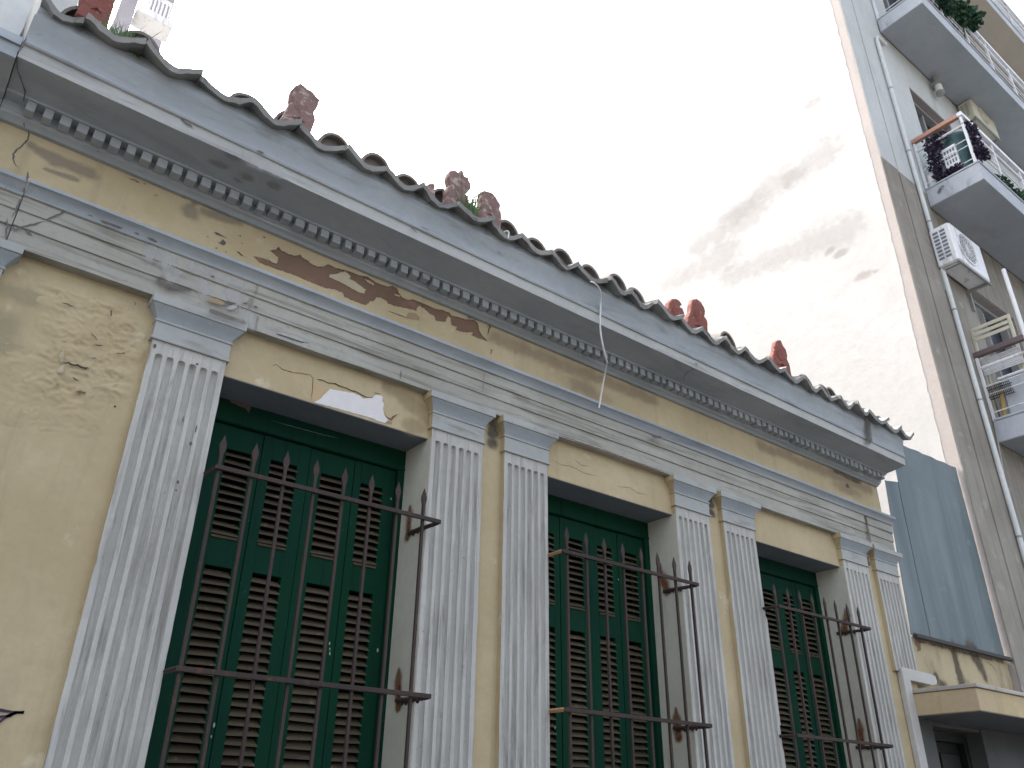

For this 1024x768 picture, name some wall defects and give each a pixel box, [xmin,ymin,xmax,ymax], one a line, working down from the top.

crack [5,36,65,239]
peeling [207,232,488,341]
peeling [312,378,398,424]